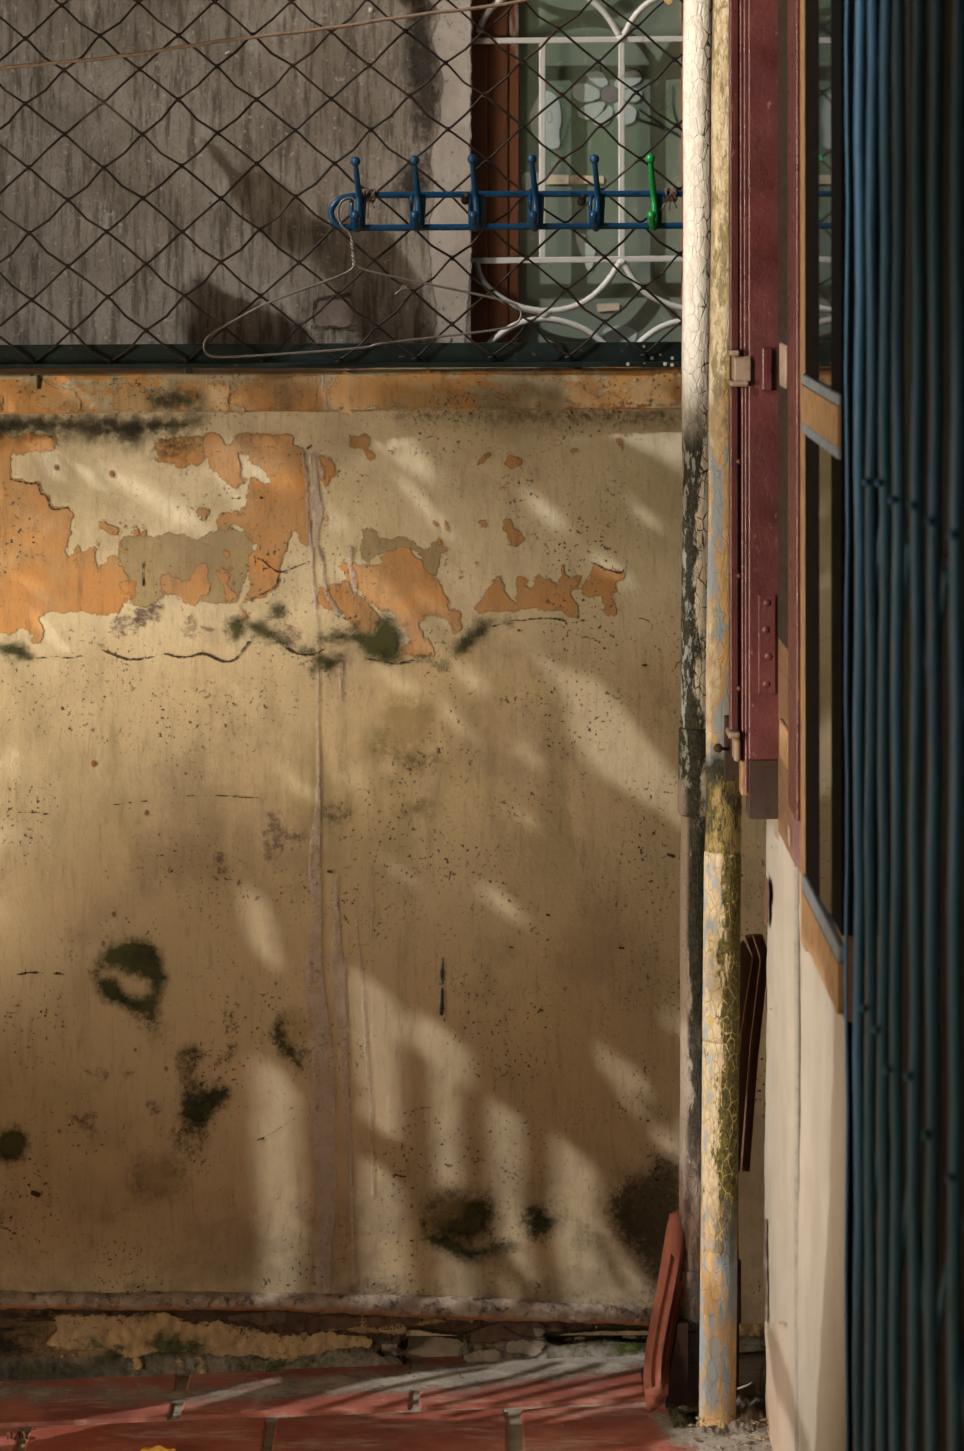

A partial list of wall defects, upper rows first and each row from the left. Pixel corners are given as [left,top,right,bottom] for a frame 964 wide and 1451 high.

peeling [292,369,465,416]
peeling [553,368,682,409]
peeling [349,433,396,462]
peeling [478,452,523,491]
peeling [0,380,336,644]
peeling [316,516,625,657]
water stain [94,937,167,1027]
water stain [181,1015,237,1136]
water stain [0,1126,27,1162]
water stain [422,1191,514,1262]
water stain [522,1207,552,1236]
water stain [147,1333,206,1355]